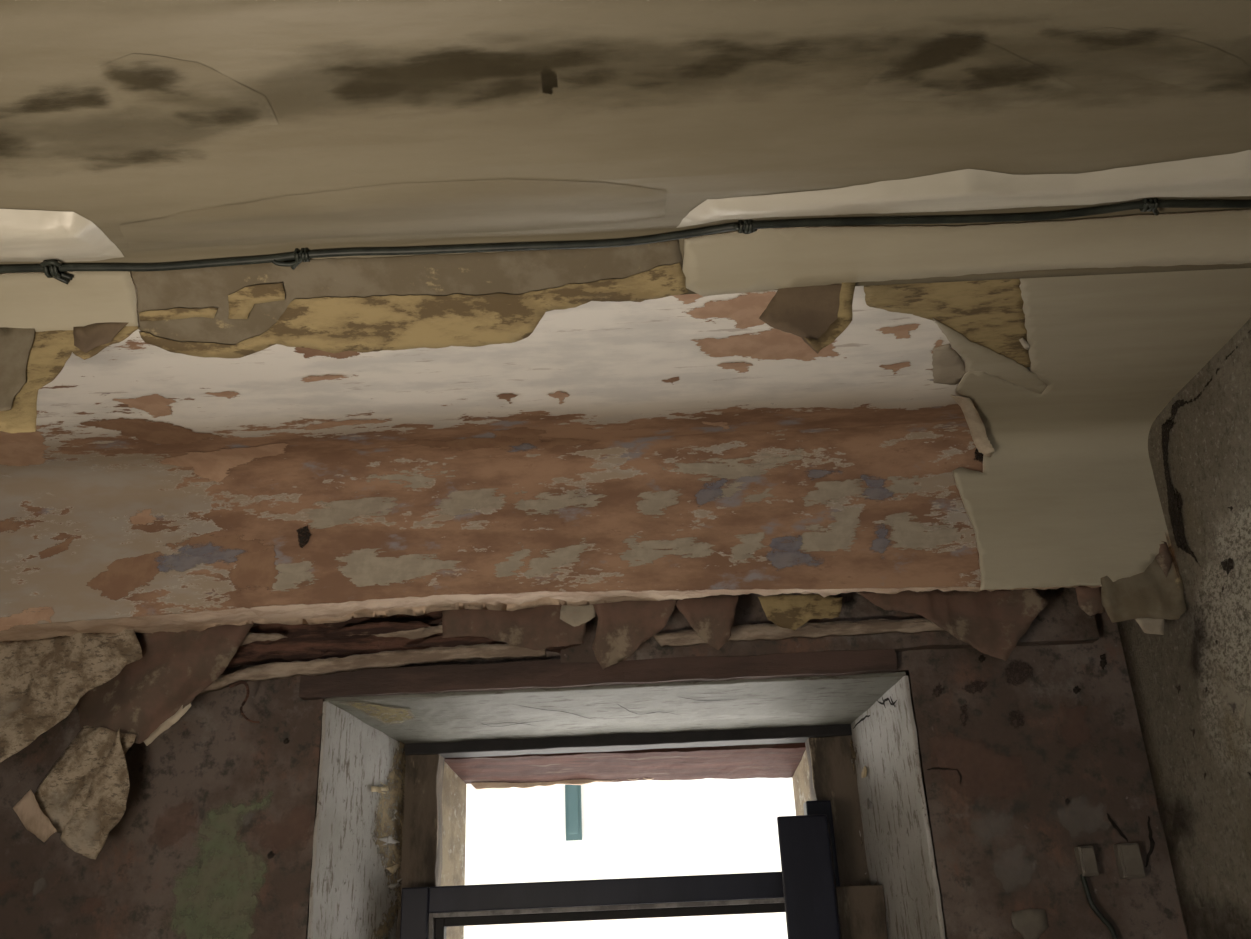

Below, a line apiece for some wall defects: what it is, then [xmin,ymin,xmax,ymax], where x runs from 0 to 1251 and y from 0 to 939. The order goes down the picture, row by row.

damp [22,93,104,113]
damp [109,71,172,90]
damp [335,52,603,99]
damp [894,35,981,76]
peeling [294,347,359,359]
peeling [672,291,840,373]
peeling [878,324,920,339]
peeling [0,425,51,466]
peeling [80,394,289,482]
crack [1161,330,1251,563]
peeling [618,448,963,569]
spalling [0,467,1101,642]